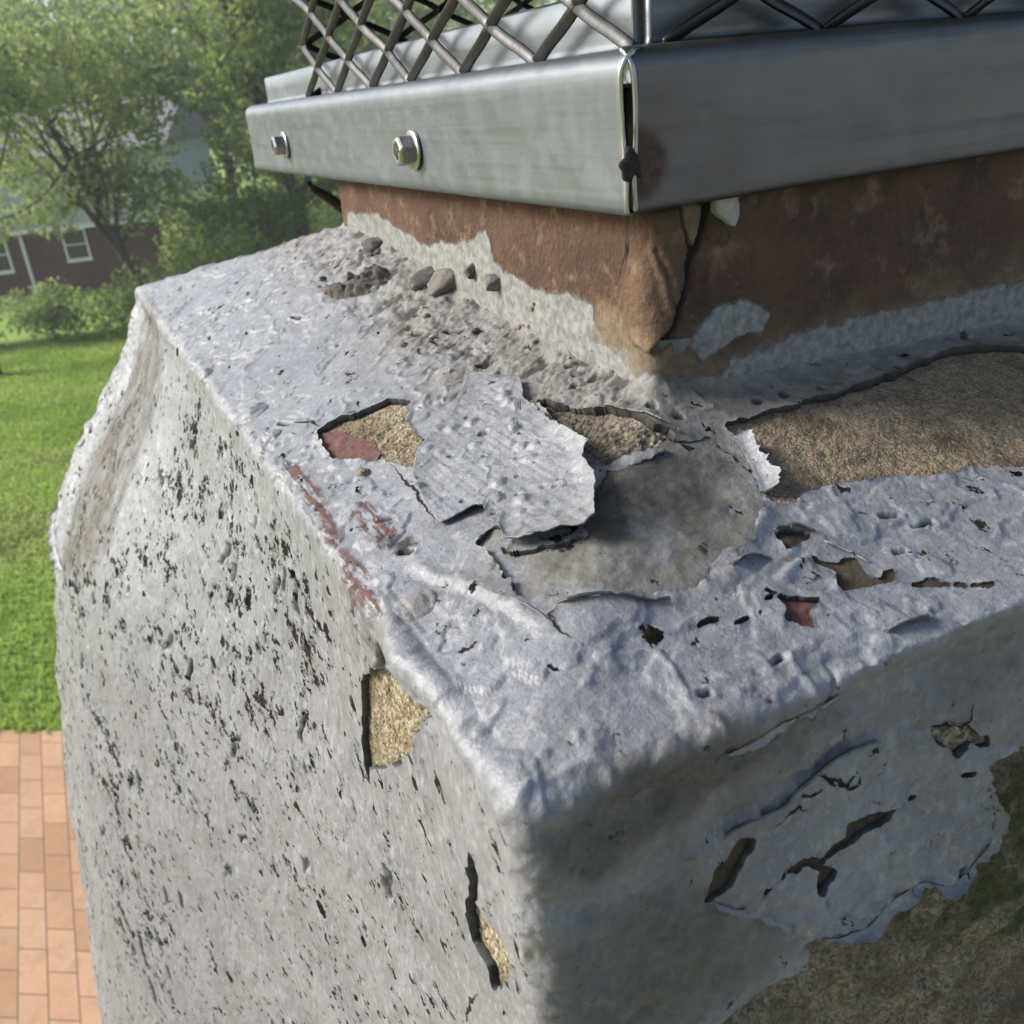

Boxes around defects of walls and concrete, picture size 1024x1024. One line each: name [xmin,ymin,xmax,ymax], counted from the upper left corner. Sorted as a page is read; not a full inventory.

crack [618,216,628,279]
crack [661,202,708,340]
spalling [320,352,1024,623]
spalling [368,668,431,767]
flaking render [713,741,1024,1024]